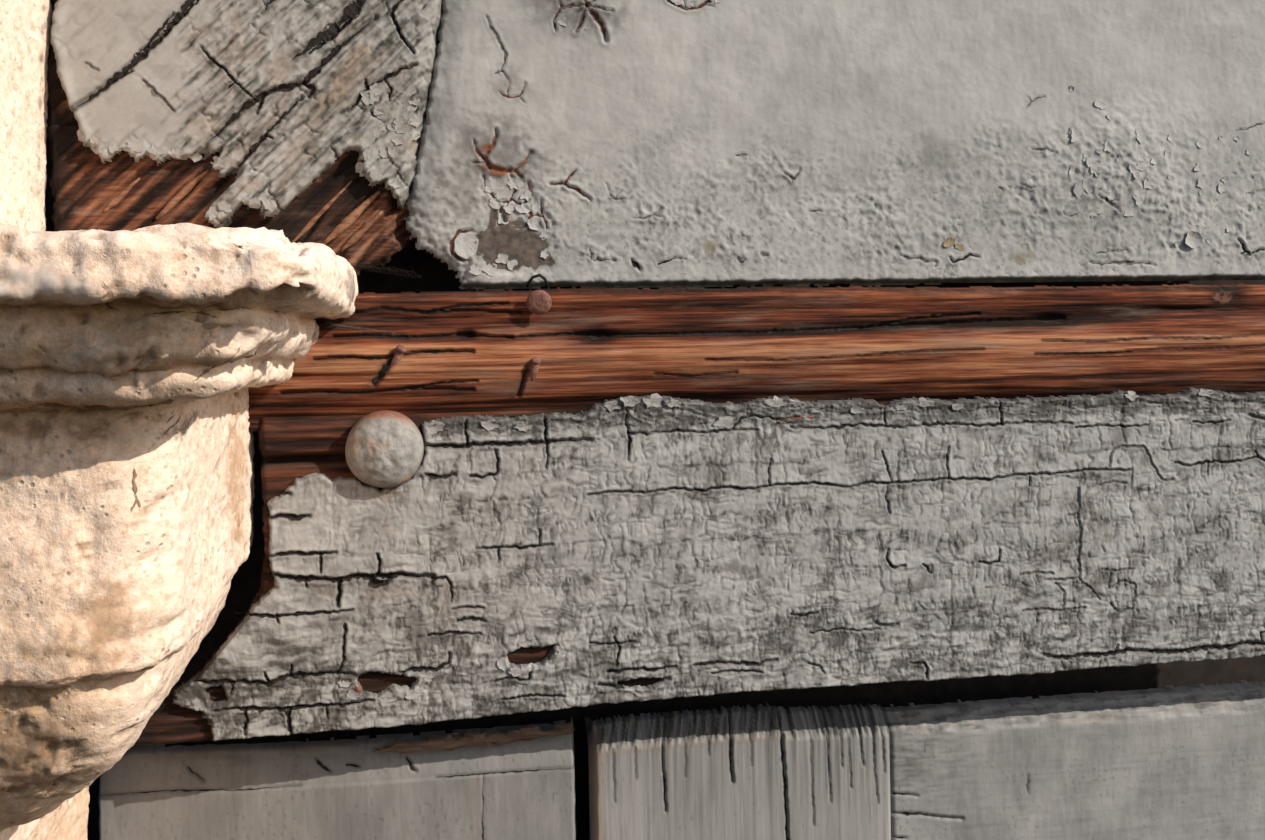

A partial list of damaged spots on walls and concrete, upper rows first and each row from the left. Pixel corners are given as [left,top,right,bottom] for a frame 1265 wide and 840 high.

crack [73,0,199,111]
crack [202,0,414,166]
spalling [293,0,366,59]
peeling [77,130,225,170]
peeling [355,83,421,189]
peeling [205,197,277,220]
peeling [469,177,555,276]
crack [426,413,591,479]
peeling [604,393,683,412]
crack [591,403,1265,616]
crack [192,551,484,734]
crack [1053,631,1265,660]